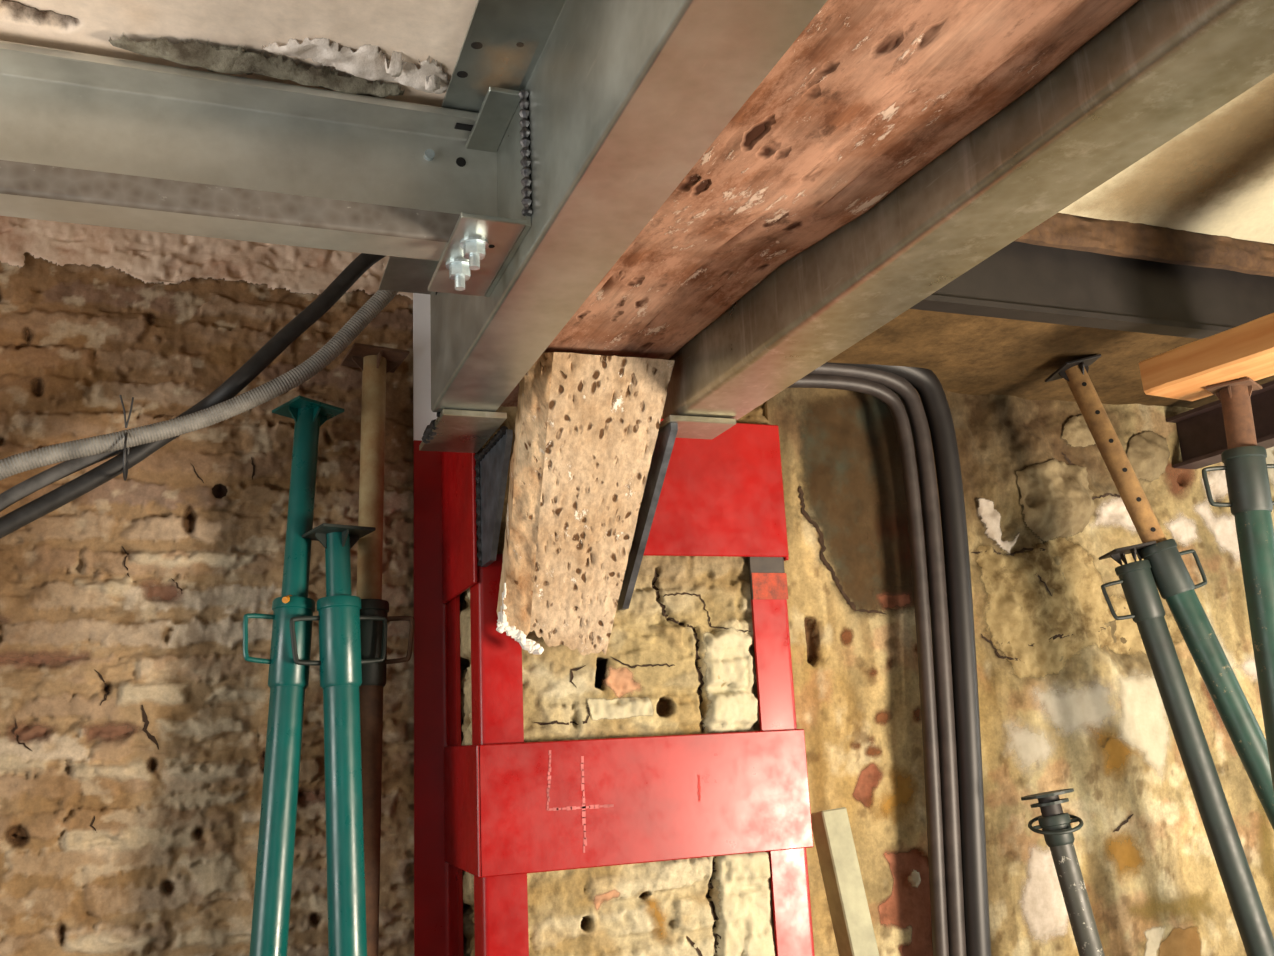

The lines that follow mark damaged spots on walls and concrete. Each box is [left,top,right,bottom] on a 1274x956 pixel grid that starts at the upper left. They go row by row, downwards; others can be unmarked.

peeling [263,38,450,94]
peeling [0,216,361,295]
peeling [346,256,389,295]
crack [534,569,751,732]
crack [799,486,886,614]
spalling [976,498,1147,679]
spalling [1164,614,1184,644]
crack [141,705,159,750]
damp [1009,725,1049,765]
damp [1039,686,1132,773]
crack [687,856,721,956]
spalling [878,848,933,956]